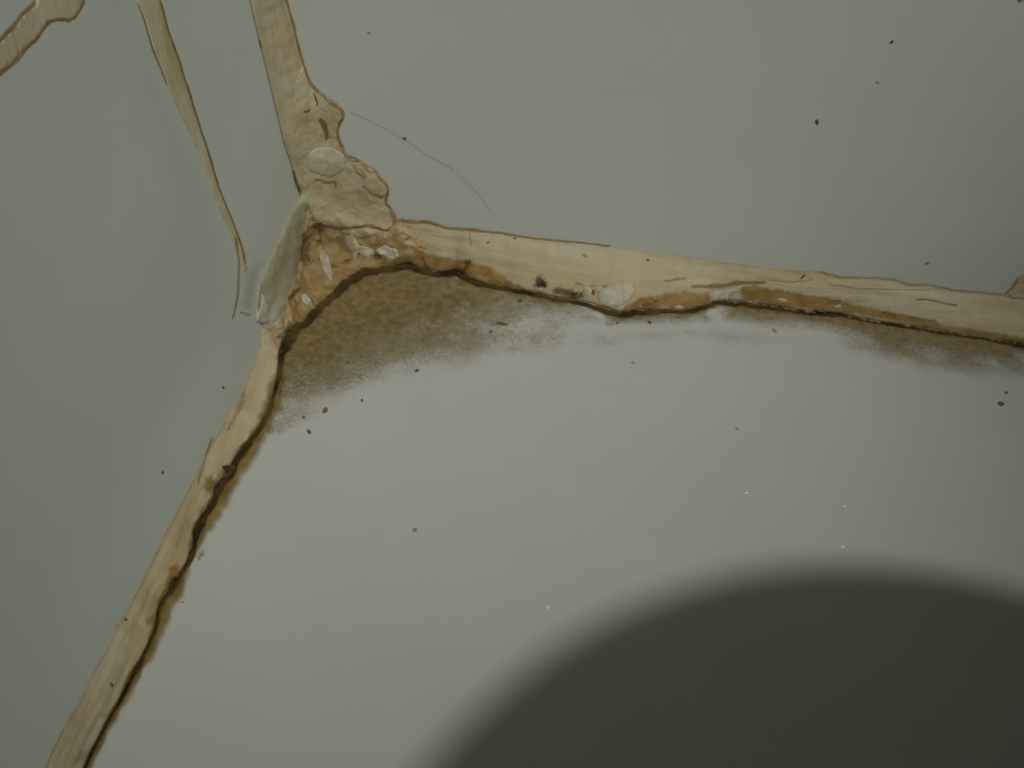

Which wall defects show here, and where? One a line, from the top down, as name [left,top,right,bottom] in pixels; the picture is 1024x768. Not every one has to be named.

peeling [344,235,399,259]
peeling [319,250,333,280]
peeling [575,282,659,310]
peeling [713,289,756,303]
water stain [278,270,594,398]
water stain [725,300,1023,365]
crack [83,231,1024,768]